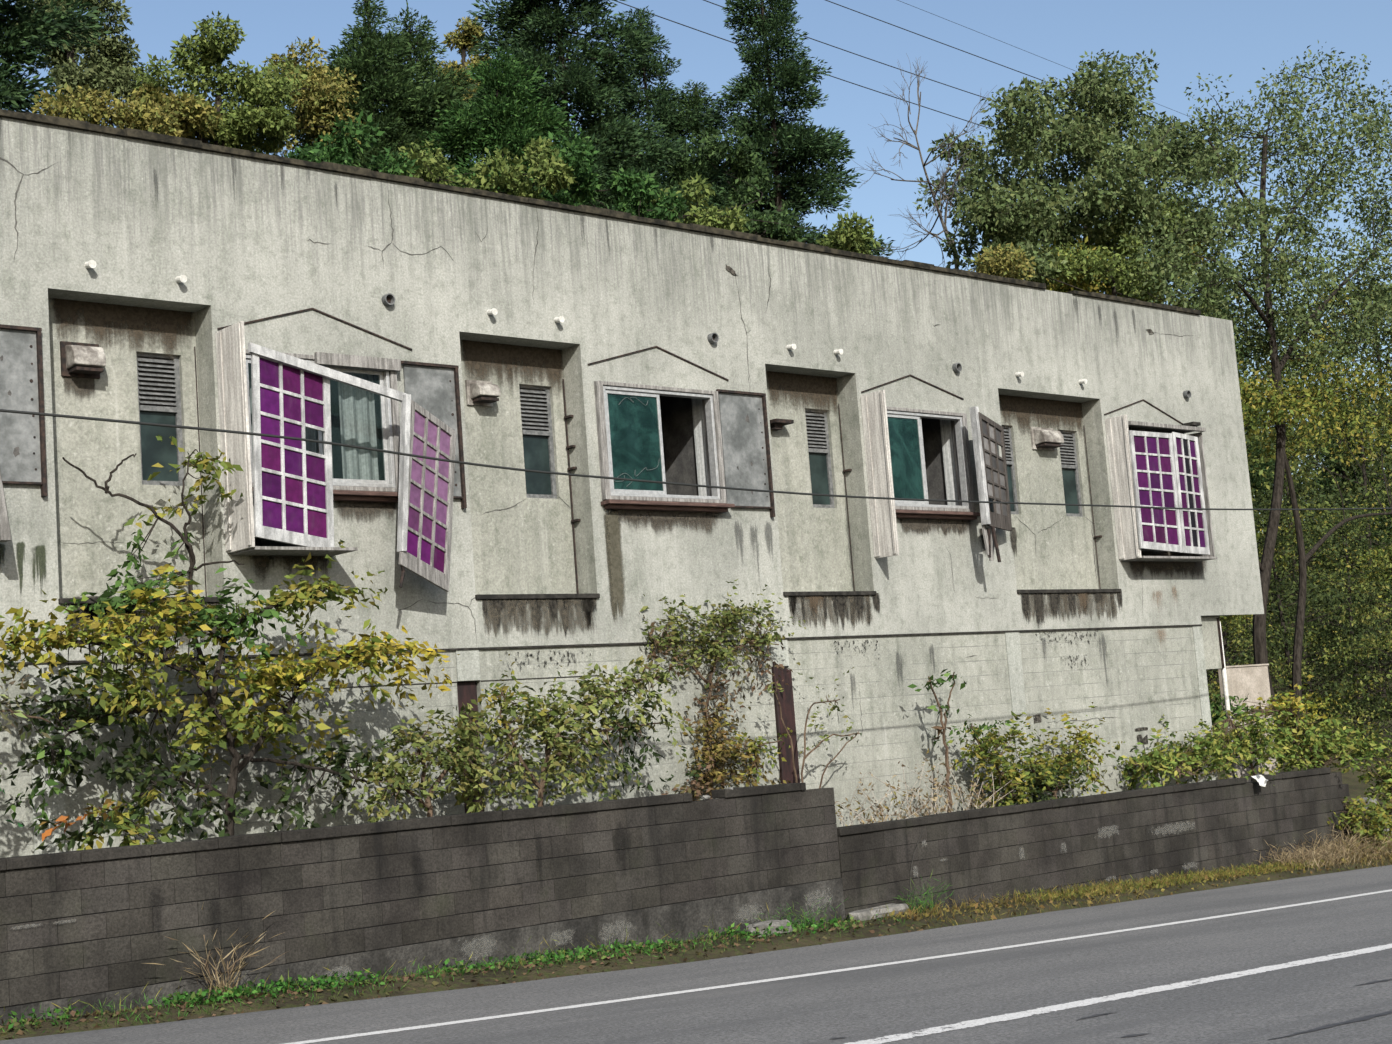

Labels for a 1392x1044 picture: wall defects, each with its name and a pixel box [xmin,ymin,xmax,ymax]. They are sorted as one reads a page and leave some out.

crack [0,157,52,259]
crack [369,191,454,269]
leakage [0,542,46,590]
leakage [482,509,719,671]
leakage [735,521,773,570]
leakage [789,593,880,659]
leakage [1021,591,1122,681]